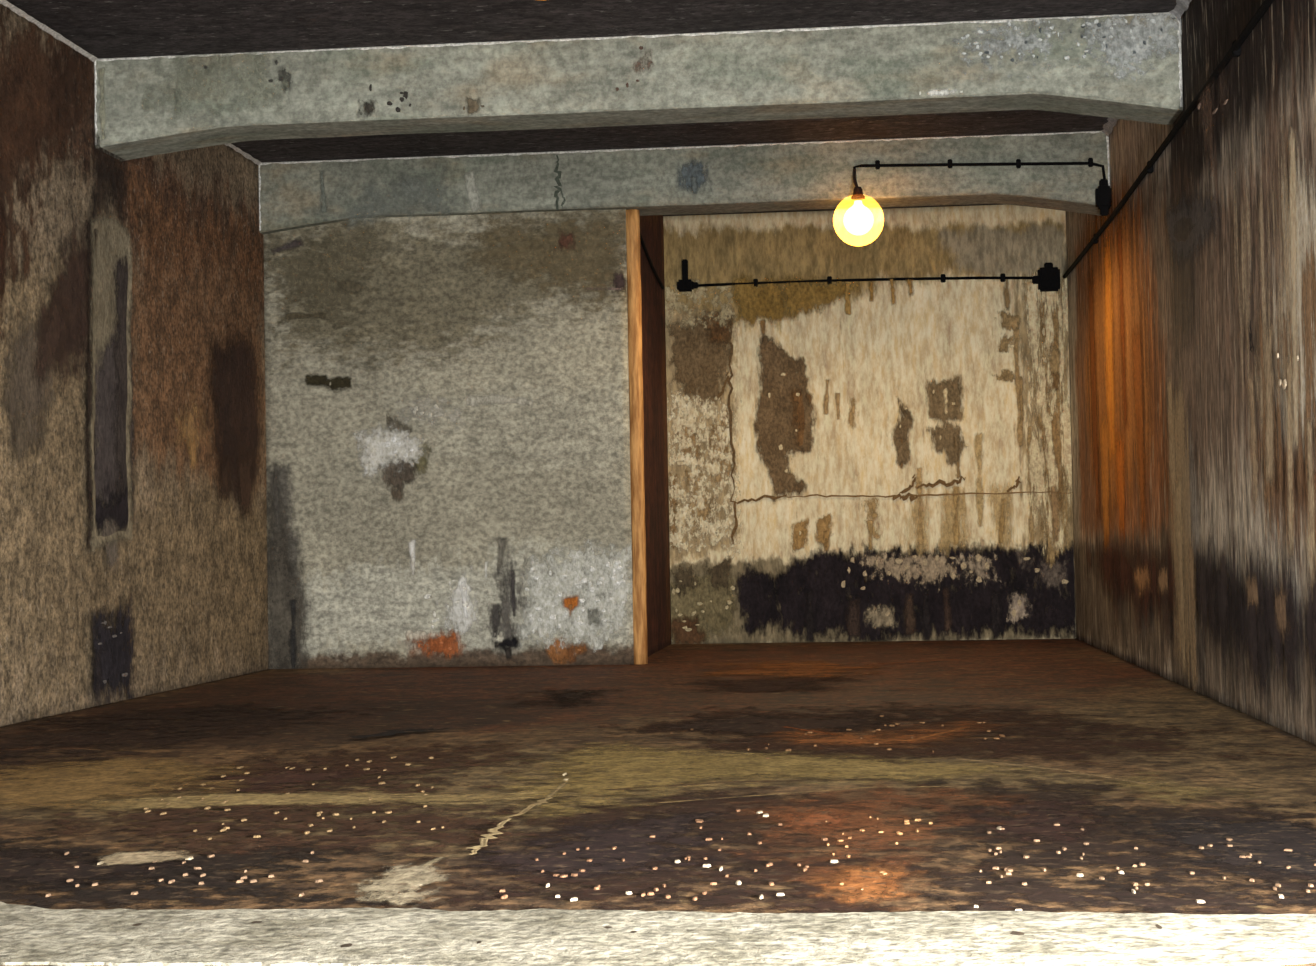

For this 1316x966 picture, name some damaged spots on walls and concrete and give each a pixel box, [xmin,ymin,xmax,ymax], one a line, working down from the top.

leakage [142,52,288,114]
leakage [0,7,136,568]
leakage [176,407,199,467]
leakage [211,325,308,669]
peeling [665,280,744,644]
spalling [754,320,855,501]
spalling [792,514,832,551]
crack [717,315,1073,544]
leakage [905,589,952,640]
spalling [893,376,968,478]
leakage [1159,380,1226,683]